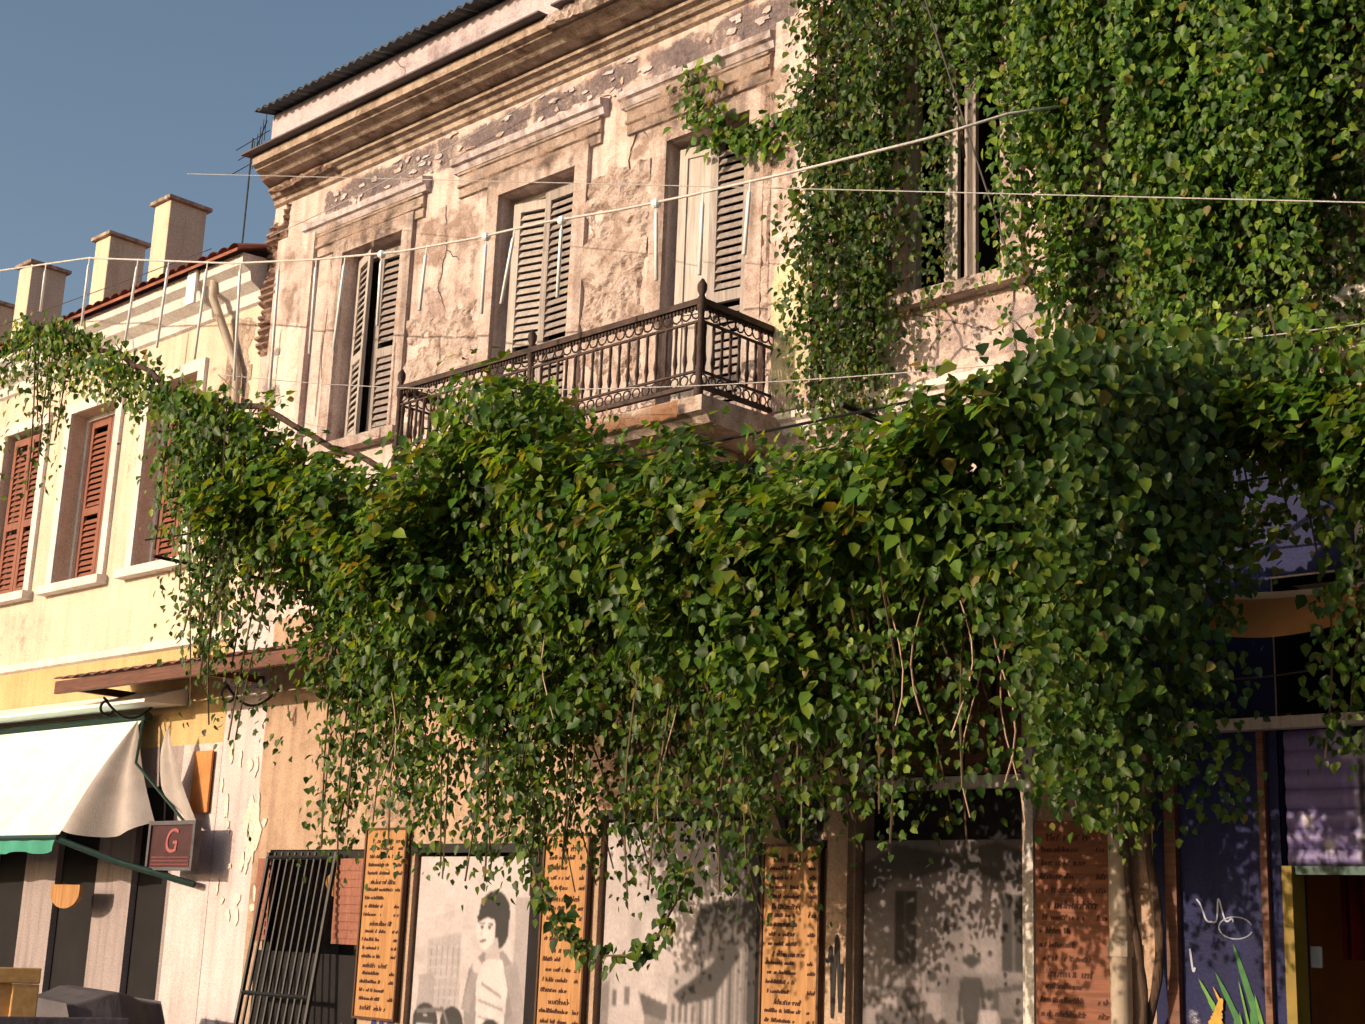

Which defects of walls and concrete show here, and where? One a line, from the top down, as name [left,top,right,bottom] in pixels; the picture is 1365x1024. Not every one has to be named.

peeling [706,5,771,43]
peeling [537,57,657,123]
peeling [333,131,475,204]
spalling [577,155,651,395]
spalling [403,299,478,437]
crack [912,283,1037,378]
peeling [216,739,267,927]